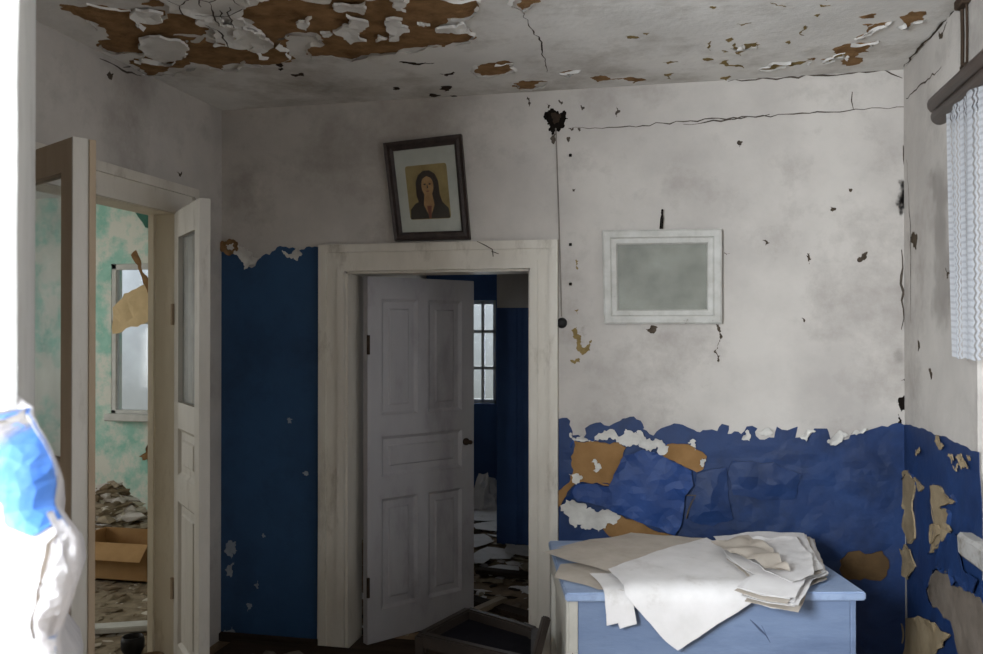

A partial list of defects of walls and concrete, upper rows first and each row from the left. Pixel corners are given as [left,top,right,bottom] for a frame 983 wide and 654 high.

flaking render [507,0,541,13]
flaking render [59,0,481,77]
flaking render [470,60,548,91]
crack [521,11,548,71]
flaking render [559,70,646,83]
crack [569,10,955,129]
flaking render [758,11,926,72]
peeling [558,429,707,537]
peeling [934,435,971,472]
peeling [0,408,74,652]
peeling [839,550,889,581]
flaking render [899,470,983,654]